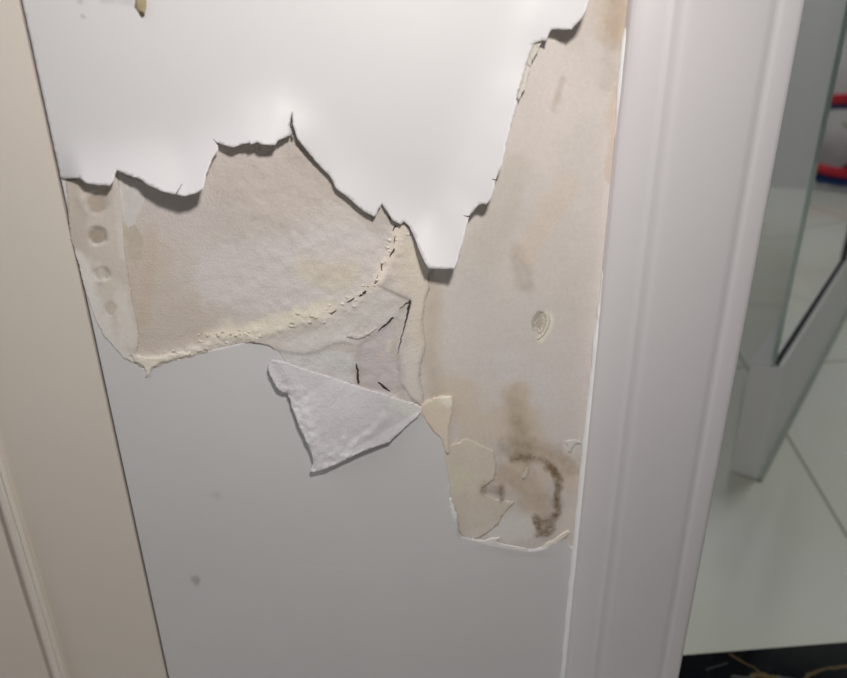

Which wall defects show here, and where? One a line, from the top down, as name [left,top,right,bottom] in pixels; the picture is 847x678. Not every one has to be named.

peeling [22,0,627,550]